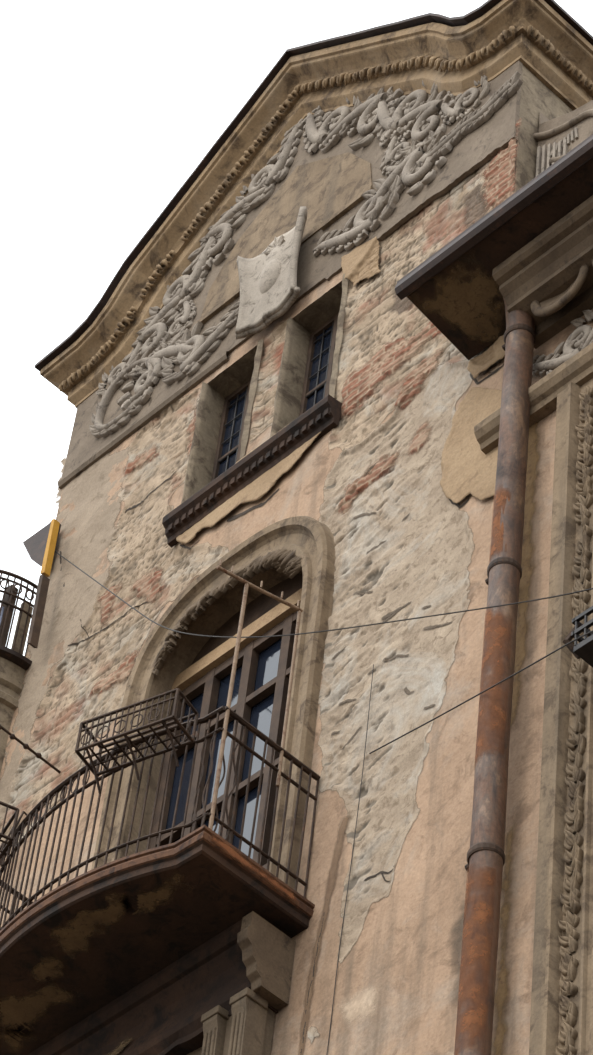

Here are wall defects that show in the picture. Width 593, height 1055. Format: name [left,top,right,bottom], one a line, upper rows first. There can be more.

peeling [0,119,521,963]
corrosion [475,422,539,763]
crack [298,816,349,1055]
crack [364,866,394,882]
corrosion [455,829,513,1055]